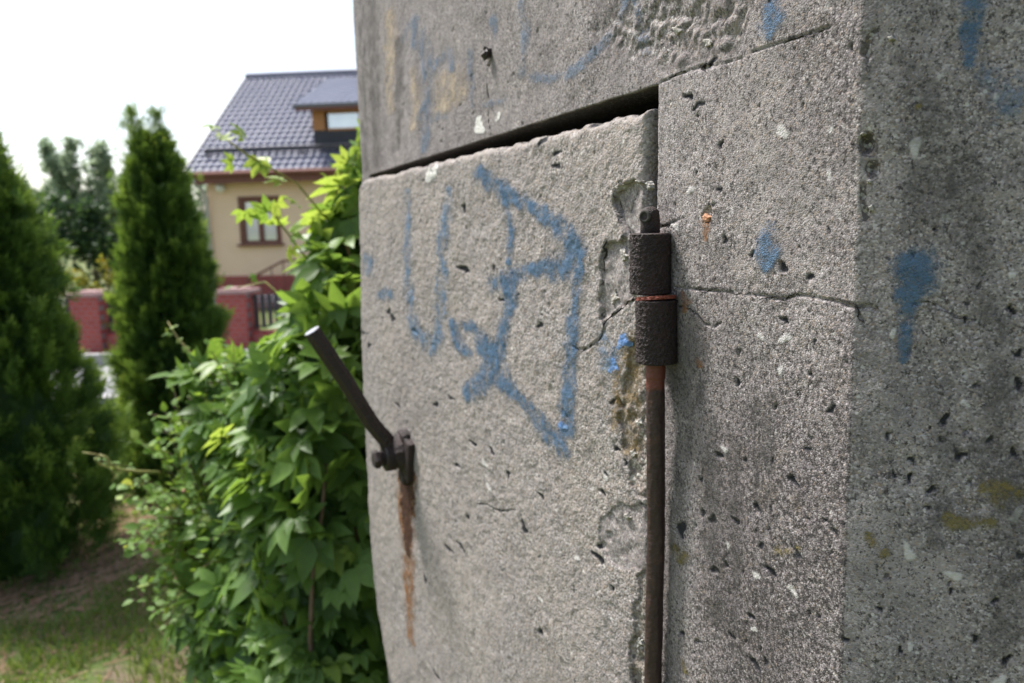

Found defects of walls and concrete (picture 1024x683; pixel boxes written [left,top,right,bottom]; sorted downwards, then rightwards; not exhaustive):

crack [575,183,636,351]
spalling [599,179,655,320]
crack [679,288,801,320]
rust [398,473,416,645]